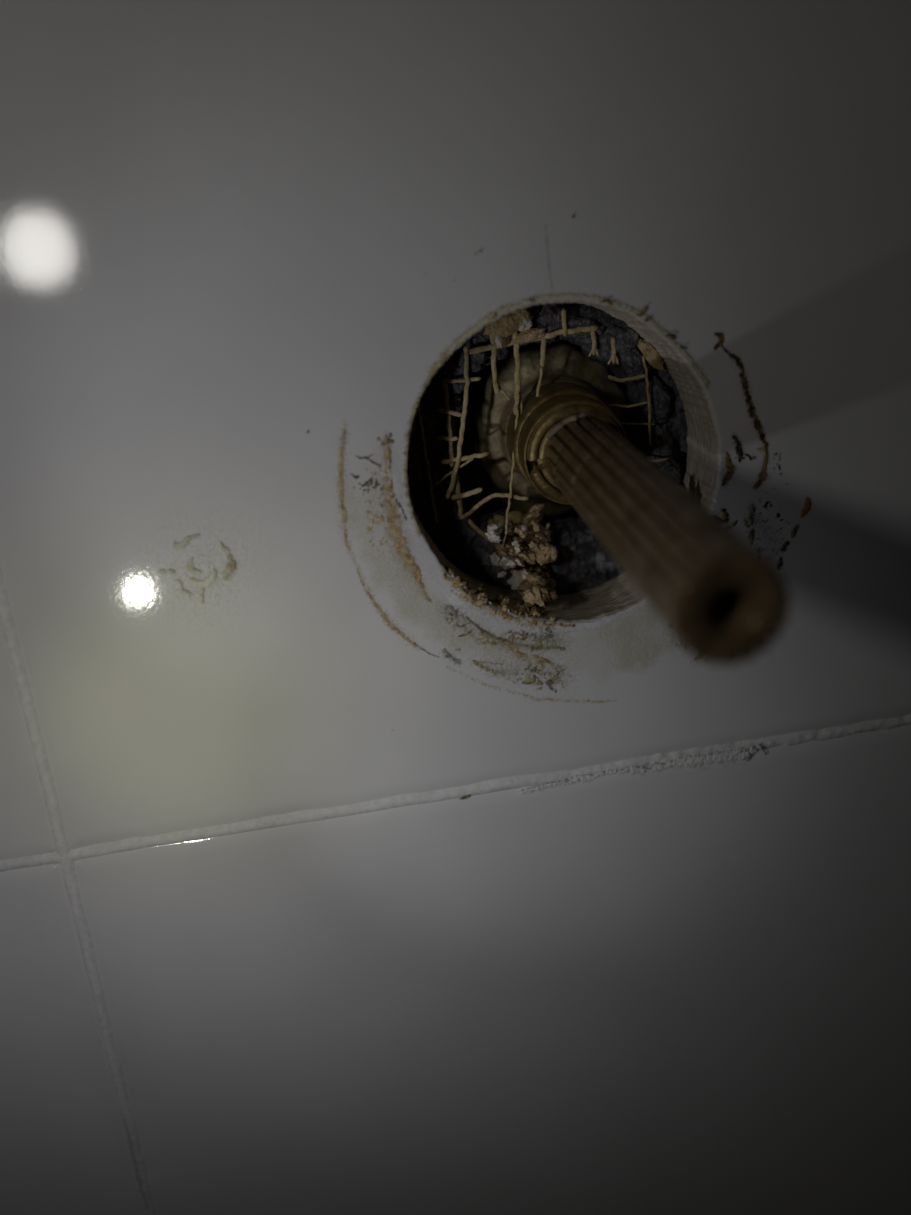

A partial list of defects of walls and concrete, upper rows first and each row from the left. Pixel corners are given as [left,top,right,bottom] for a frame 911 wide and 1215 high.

spalling [403,294,709,536]